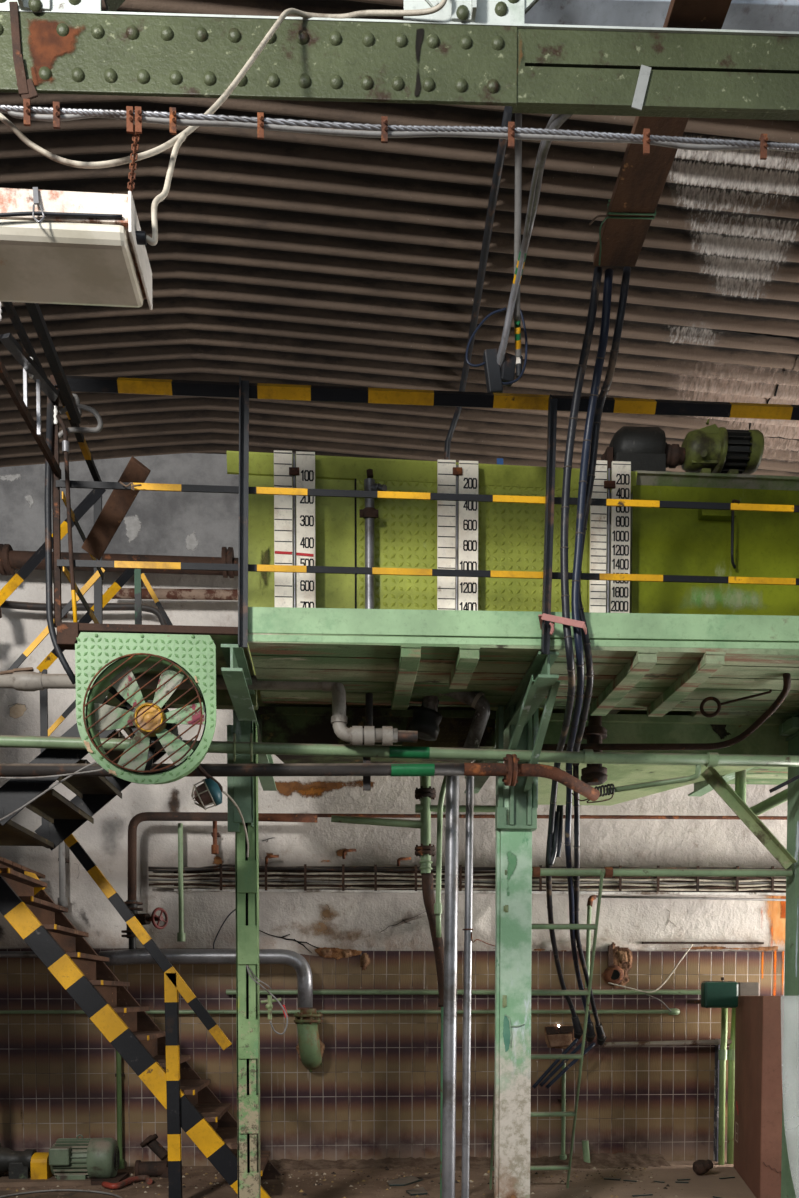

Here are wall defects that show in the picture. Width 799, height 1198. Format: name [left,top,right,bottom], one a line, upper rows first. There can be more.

corrosion [28,19,84,86]
efflorescence [669,137,799,299]
efflorescence [670,327,715,344]
crack [709,328,799,441]